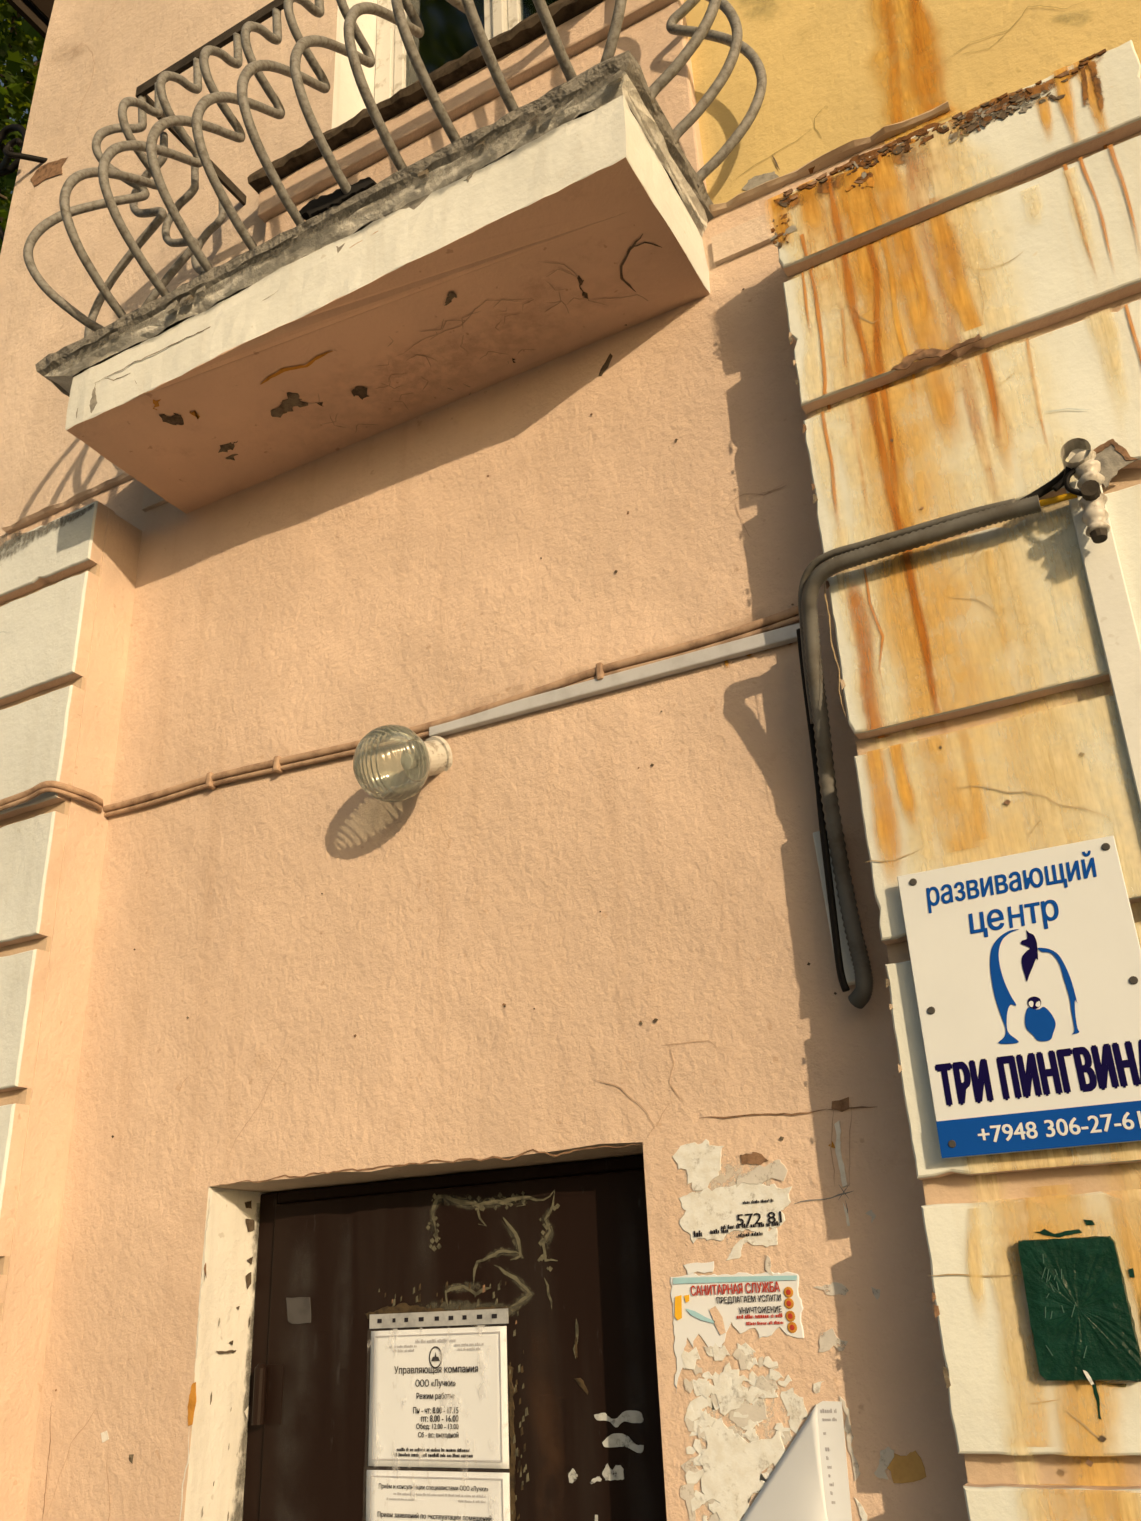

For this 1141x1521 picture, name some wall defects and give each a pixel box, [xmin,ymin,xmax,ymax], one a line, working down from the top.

spalling [742,49,1107,247]
corrosion [767,0,1141,532]
spalling [891,334,982,370]
peeling [153,399,200,425]
peeling [271,392,323,418]
corrosion [837,501,1141,941]
crack [591,1040,715,1139]
corrosion [968,1148,1069,1202]
corrosion [1027,1185,1069,1240]
corrosion [1111,1141,1141,1305]
peeling [874,1450,926,1483]
corrosion [1072,1381,1139,1521]